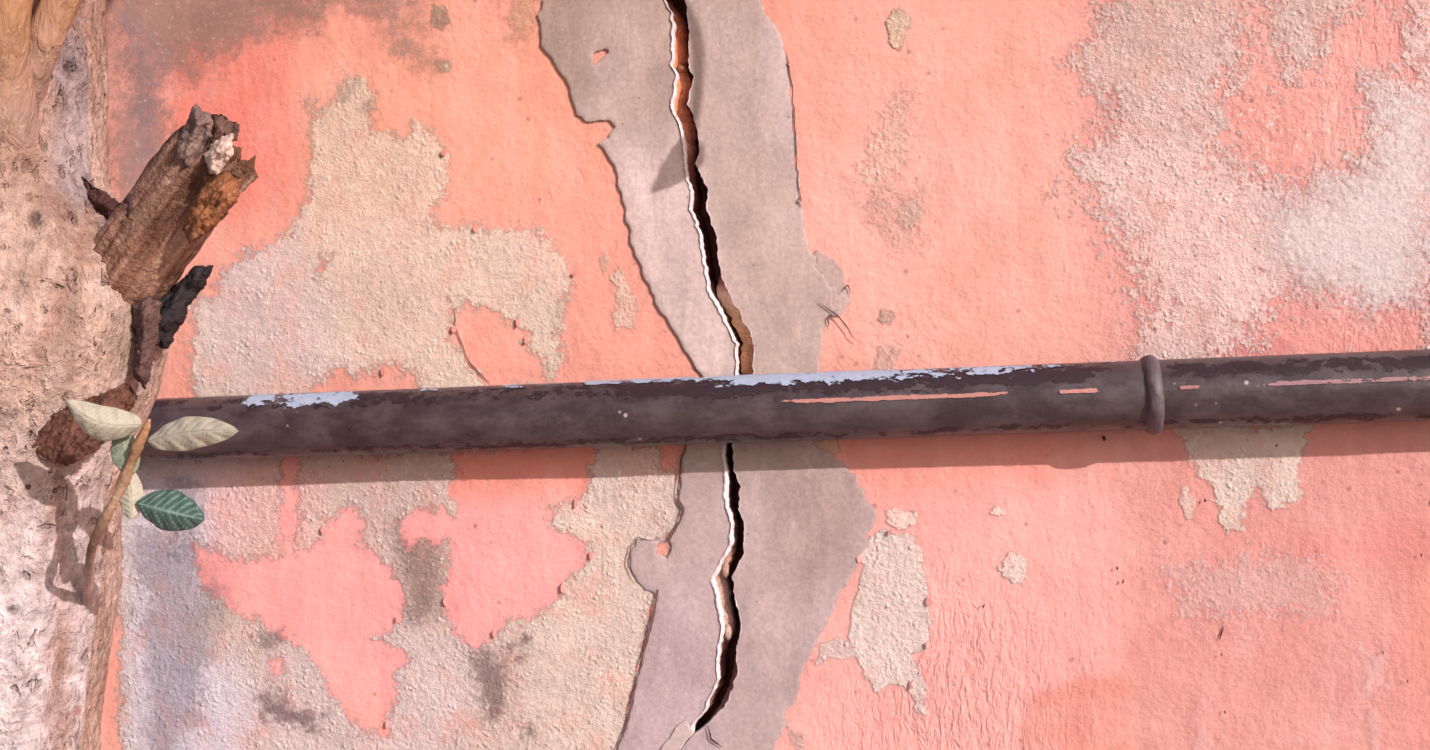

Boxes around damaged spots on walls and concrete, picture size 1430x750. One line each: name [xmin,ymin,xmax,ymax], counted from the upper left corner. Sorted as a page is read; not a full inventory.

peeling [184,70,577,408]
crack [664,0,755,375]
water stain [1262,92,1430,312]
peeling [114,446,684,750]
crack [616,445,687,750]
crack [661,443,745,750]
peeling [815,507,933,715]
peeling [1171,425,1314,535]